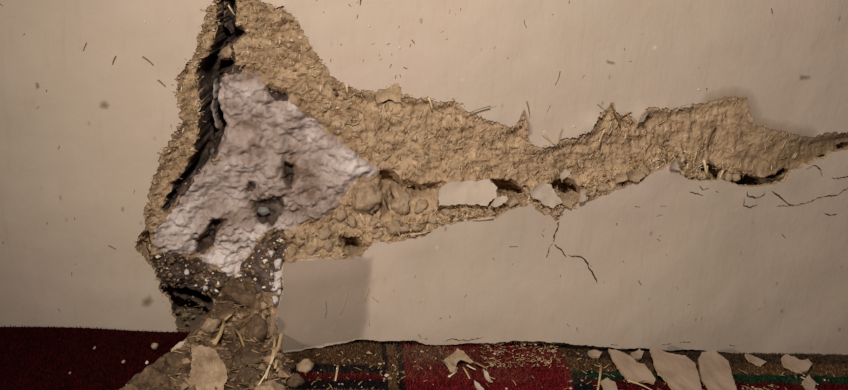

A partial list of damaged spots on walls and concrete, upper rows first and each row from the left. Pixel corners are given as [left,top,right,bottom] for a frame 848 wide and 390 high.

flaking render [134,0,848,349]
crack [743,165,848,216]
crack [546,219,597,282]